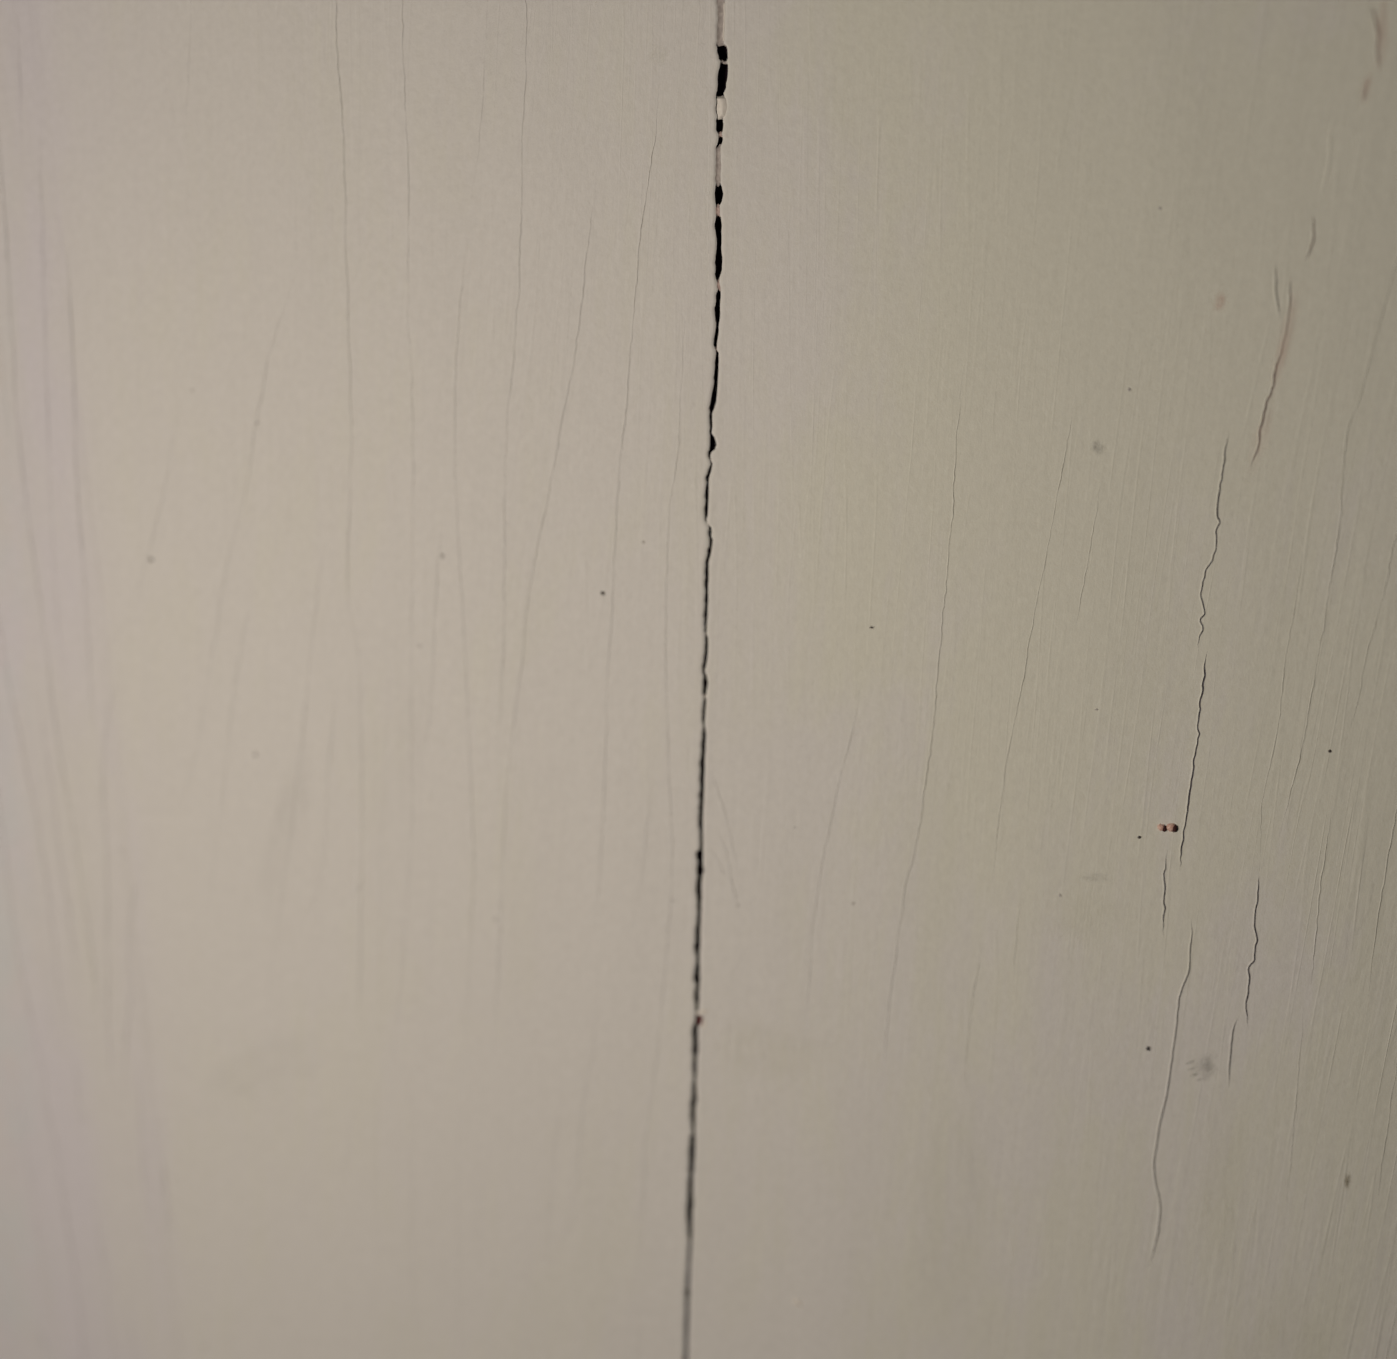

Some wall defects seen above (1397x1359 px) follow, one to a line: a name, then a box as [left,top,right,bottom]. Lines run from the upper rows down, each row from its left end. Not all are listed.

crack [684,0,728,1359]
crack [1147,213,1315,1270]
crack [1227,258,1397,1088]